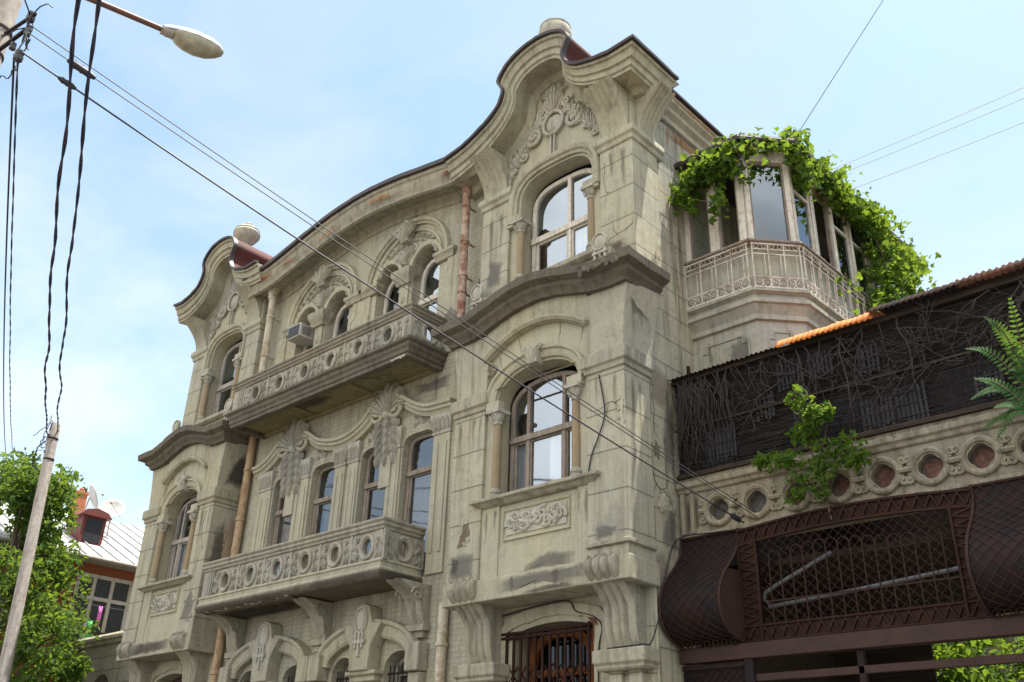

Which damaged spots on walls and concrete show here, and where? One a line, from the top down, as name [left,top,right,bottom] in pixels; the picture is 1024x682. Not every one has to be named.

damp [651,371,674,469]
damp [228,457,245,485]
damp [210,532,223,562]
damp [507,554,577,591]